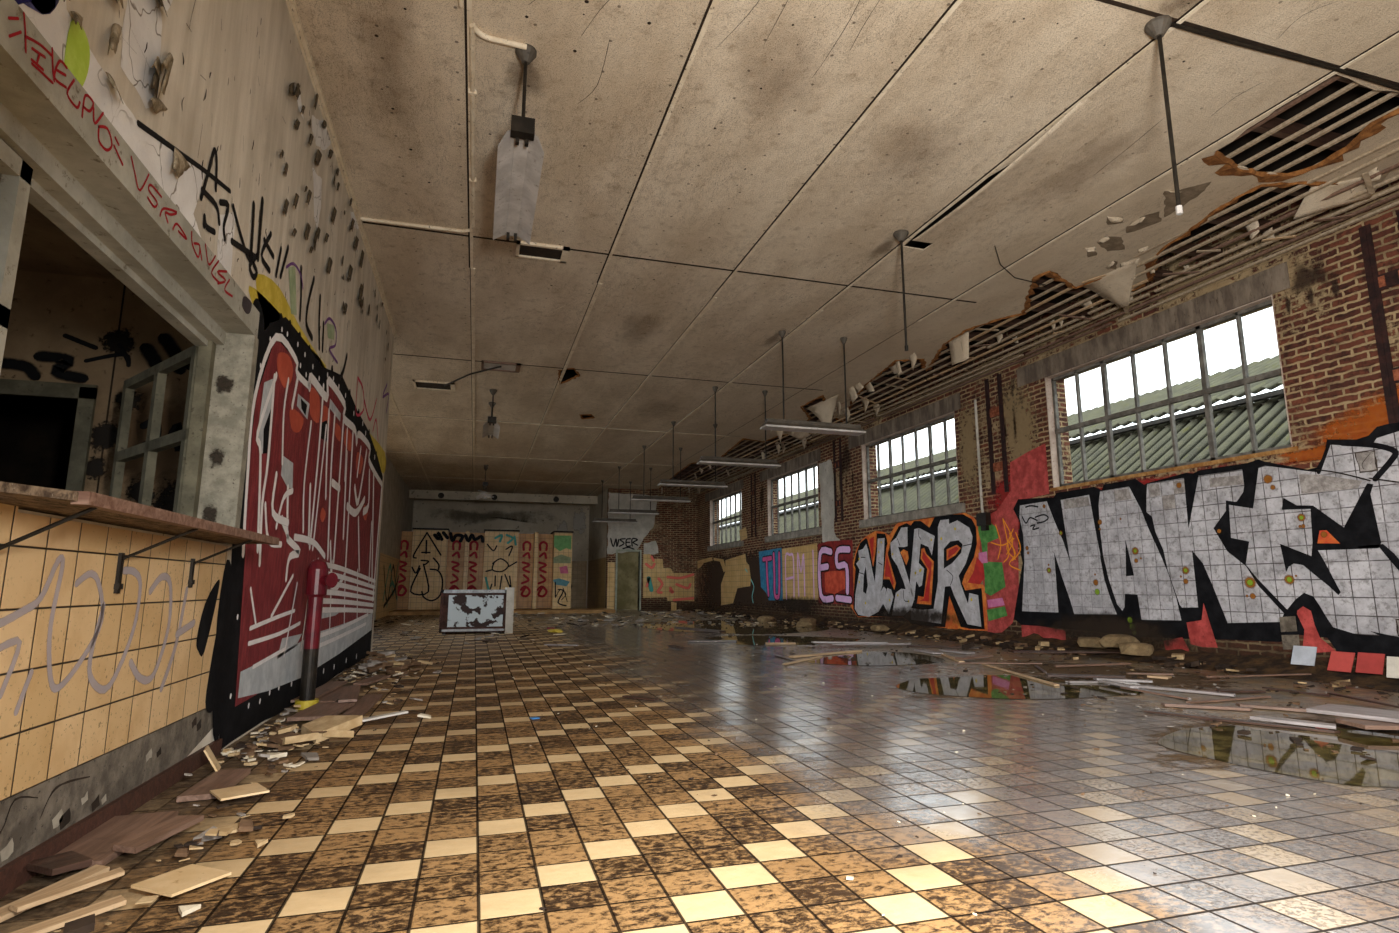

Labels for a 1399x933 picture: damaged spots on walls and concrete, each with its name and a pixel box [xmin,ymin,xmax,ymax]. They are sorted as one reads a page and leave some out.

peeling [19,0,83,62]
peeling [83,0,205,237]
peeling [217,212,235,275]
peeling [284,82,389,360]
peeling [1085,182,1211,270]
peeling [699,548,797,611]